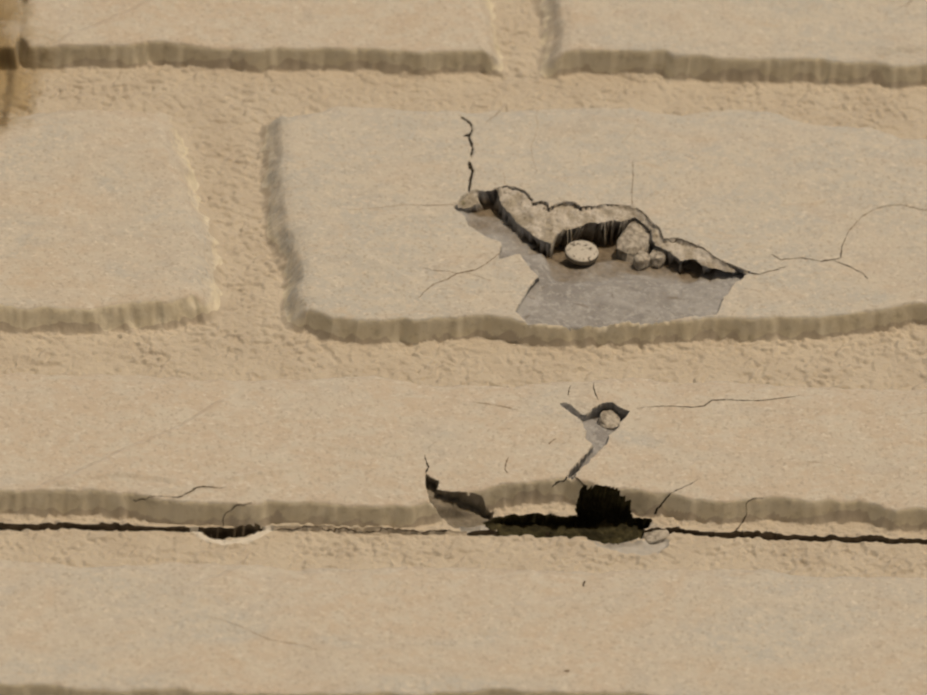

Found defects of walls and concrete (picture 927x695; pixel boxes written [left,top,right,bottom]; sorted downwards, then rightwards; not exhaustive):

crack [349,105,507,210]
spalling [454,185,751,331]
crack [751,205,925,279]
crack [643,396,795,408]
spalling [560,402,630,479]
crack [134,486,251,525]
spalling [425,474,670,555]
crack [654,479,698,514]
crack [733,498,763,535]